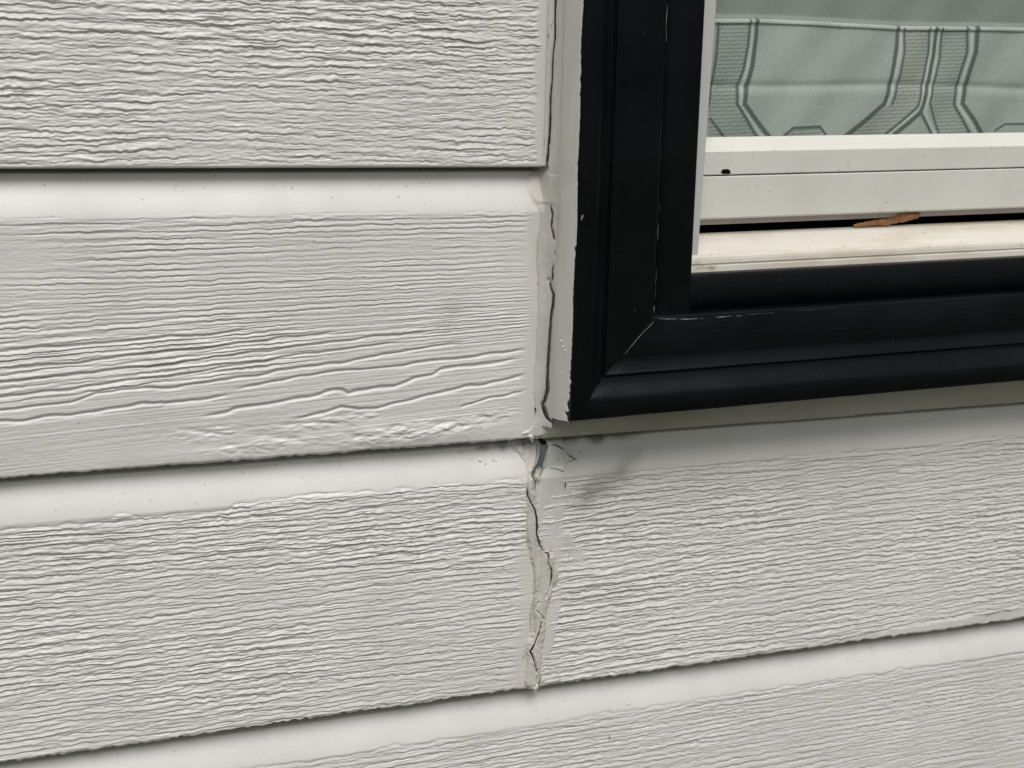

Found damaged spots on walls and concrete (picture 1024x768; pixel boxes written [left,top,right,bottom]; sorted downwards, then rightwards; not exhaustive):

crack [541,207,556,423]
crack [527,471,552,687]